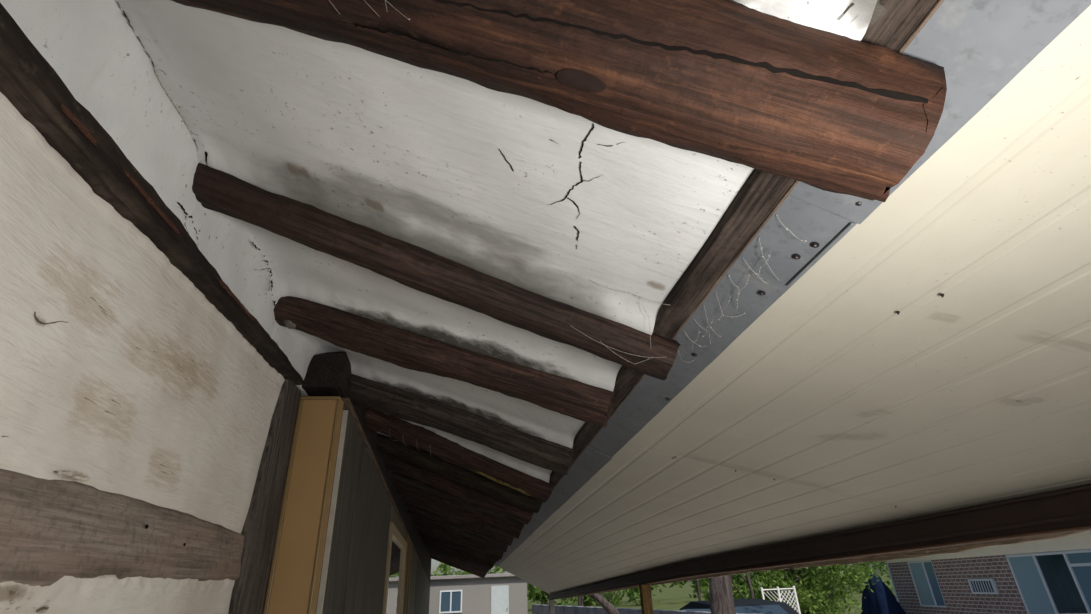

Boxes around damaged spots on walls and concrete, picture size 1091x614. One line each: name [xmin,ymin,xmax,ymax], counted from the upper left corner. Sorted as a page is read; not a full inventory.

damp [288,179,570,305]
crack [550,124,620,249]
flaking render [0,586,50,612]